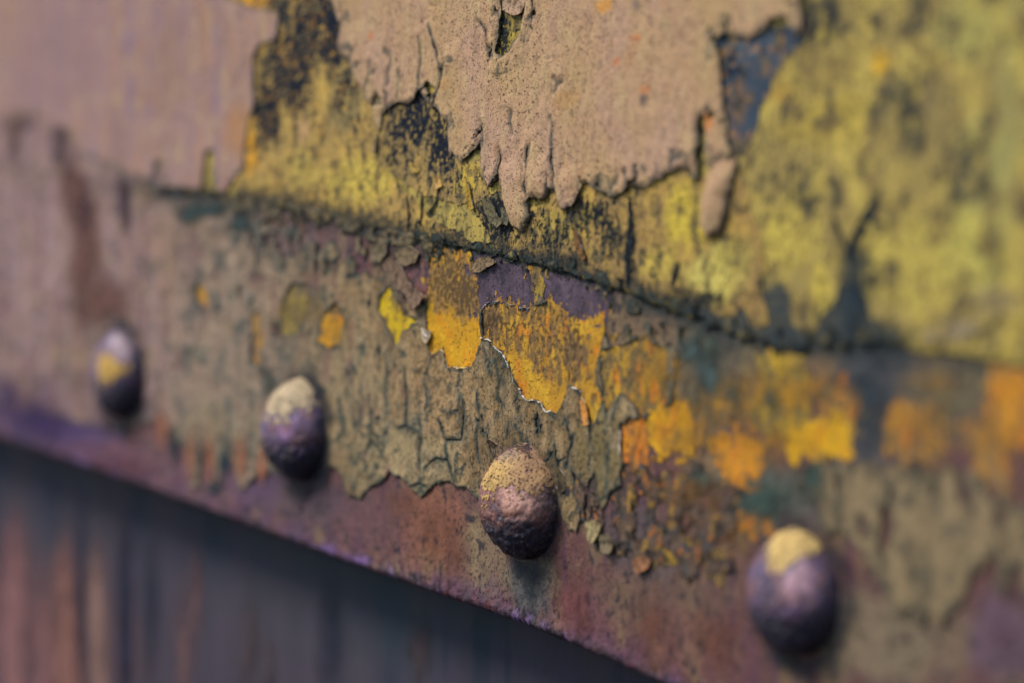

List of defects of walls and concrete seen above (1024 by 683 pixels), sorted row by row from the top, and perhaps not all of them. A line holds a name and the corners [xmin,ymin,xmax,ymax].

peeling [179,0,1024,582]
crack [625,183,633,285]
crack [671,261,680,285]
crack [399,384,480,487]
rust [0,525,106,683]
rust [344,556,368,564]